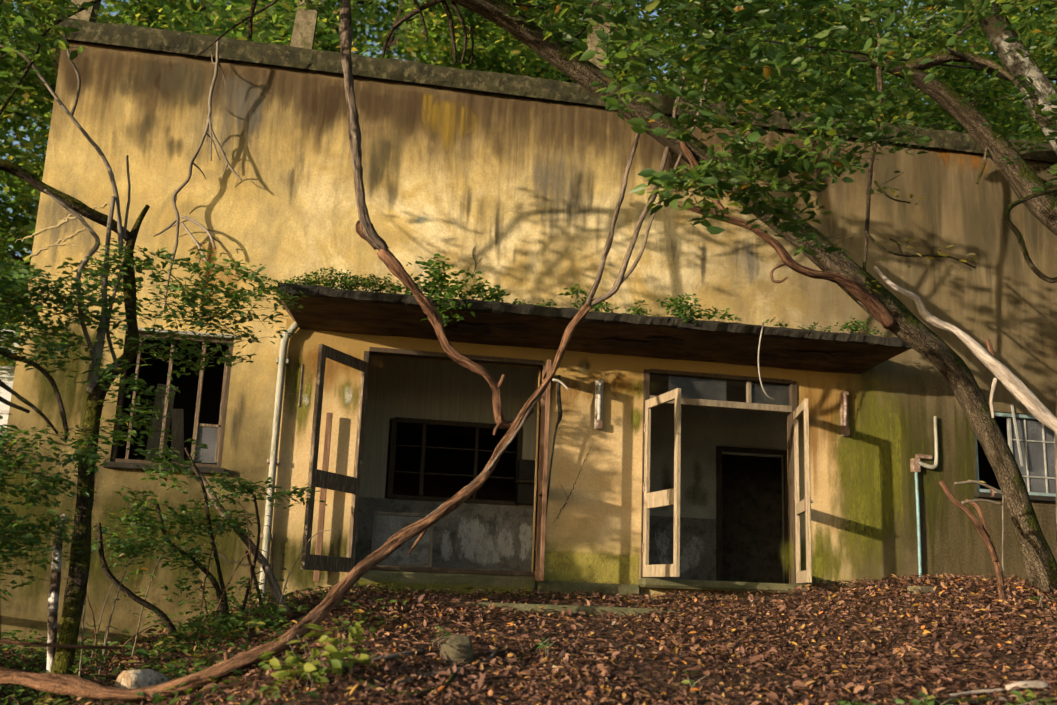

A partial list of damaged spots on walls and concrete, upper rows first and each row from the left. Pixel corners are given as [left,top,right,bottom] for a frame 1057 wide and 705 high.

damp [285,361,311,430]
crack [553,450,590,523]
damp [790,384,943,585]